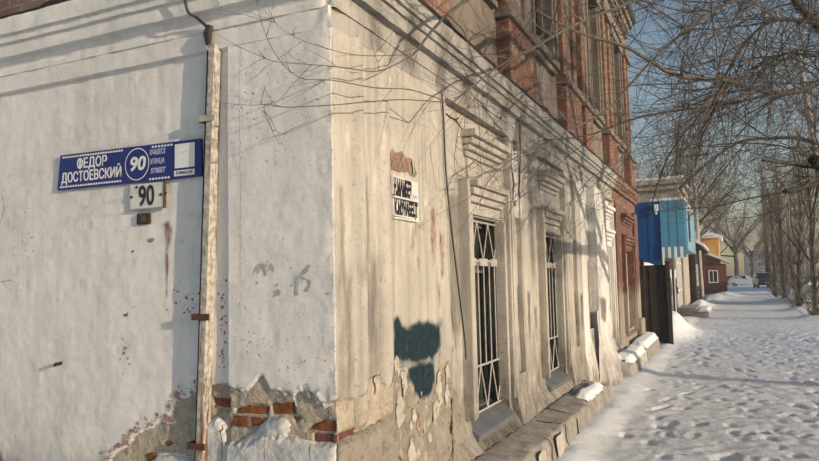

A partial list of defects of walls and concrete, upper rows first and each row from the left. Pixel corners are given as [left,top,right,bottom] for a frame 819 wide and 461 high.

flaking render [390,148,417,178]
spalling [100,379,197,461]
flaking render [210,355,475,461]